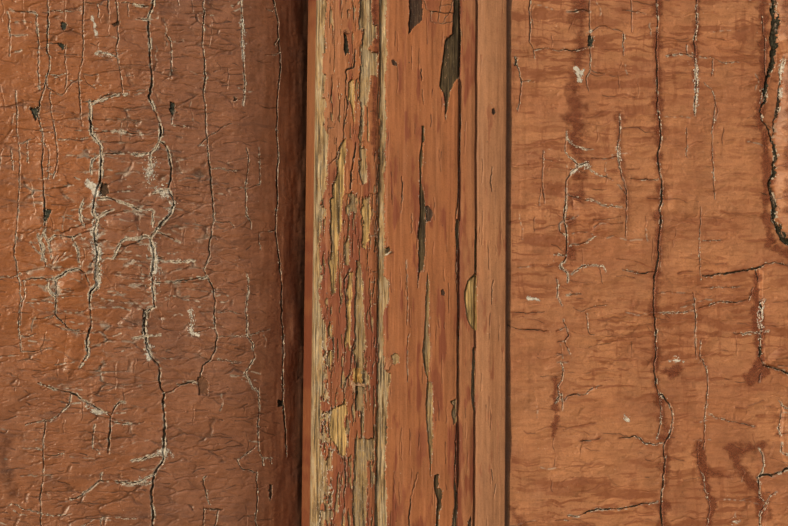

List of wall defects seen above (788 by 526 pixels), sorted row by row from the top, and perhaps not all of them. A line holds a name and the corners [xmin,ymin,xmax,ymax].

peeling [408,0,423,34]
peeling [439,0,461,117]
crack [0,0,287,526]
peeling [310,0,399,526]
peeling [417,126,443,526]
peeling [464,228,478,331]
crack [508,0,788,526]